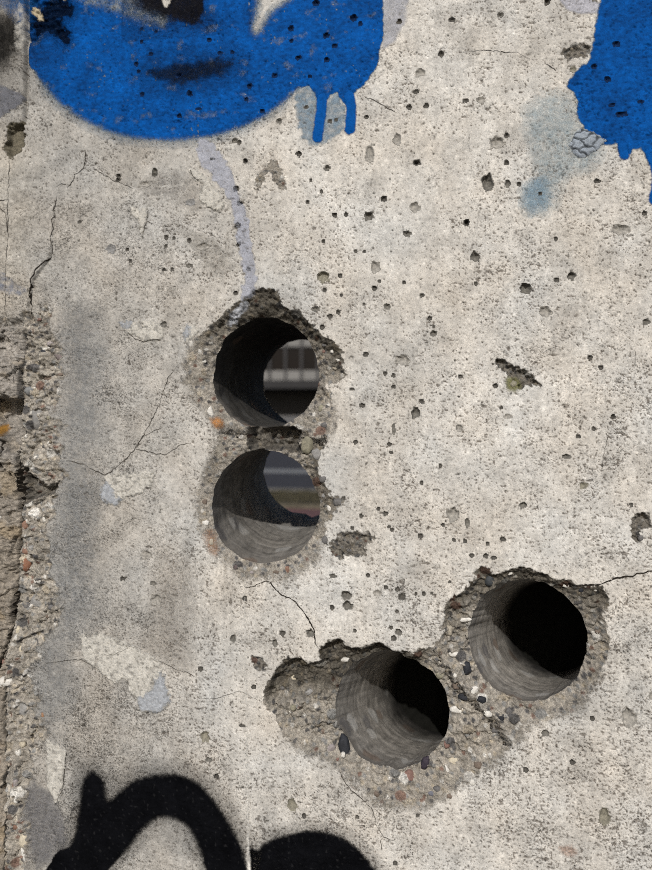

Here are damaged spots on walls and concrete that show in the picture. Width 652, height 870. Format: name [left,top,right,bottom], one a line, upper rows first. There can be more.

spalling [3,121,26,160]
crack [28,151,132,315]
crack [66,363,188,475]
spalling [181,287,376,580]
crack [0,440,28,561]
crack [0,584,21,668]
crack [240,581,320,649]
crack [556,570,652,588]
spalling [251,566,610,810]